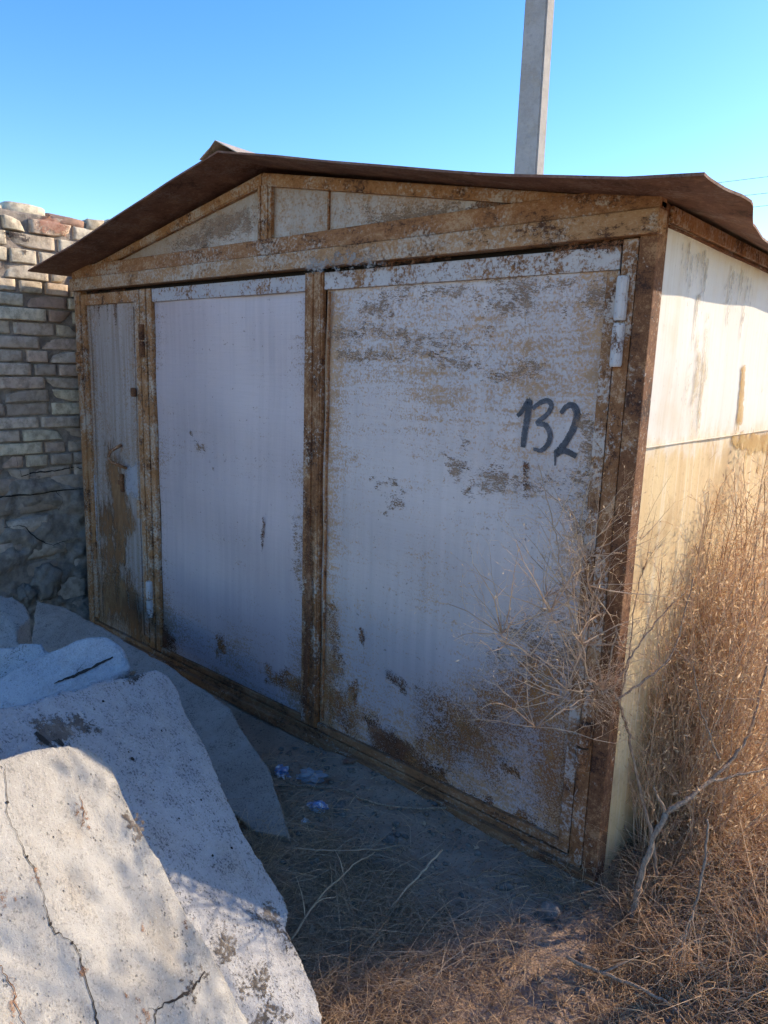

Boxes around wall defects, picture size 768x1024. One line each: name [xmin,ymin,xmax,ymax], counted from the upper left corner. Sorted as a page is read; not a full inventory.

corrosion [172,205,255,251]
corrosion [96,442,136,600]
corrosion [264,505,577,834]